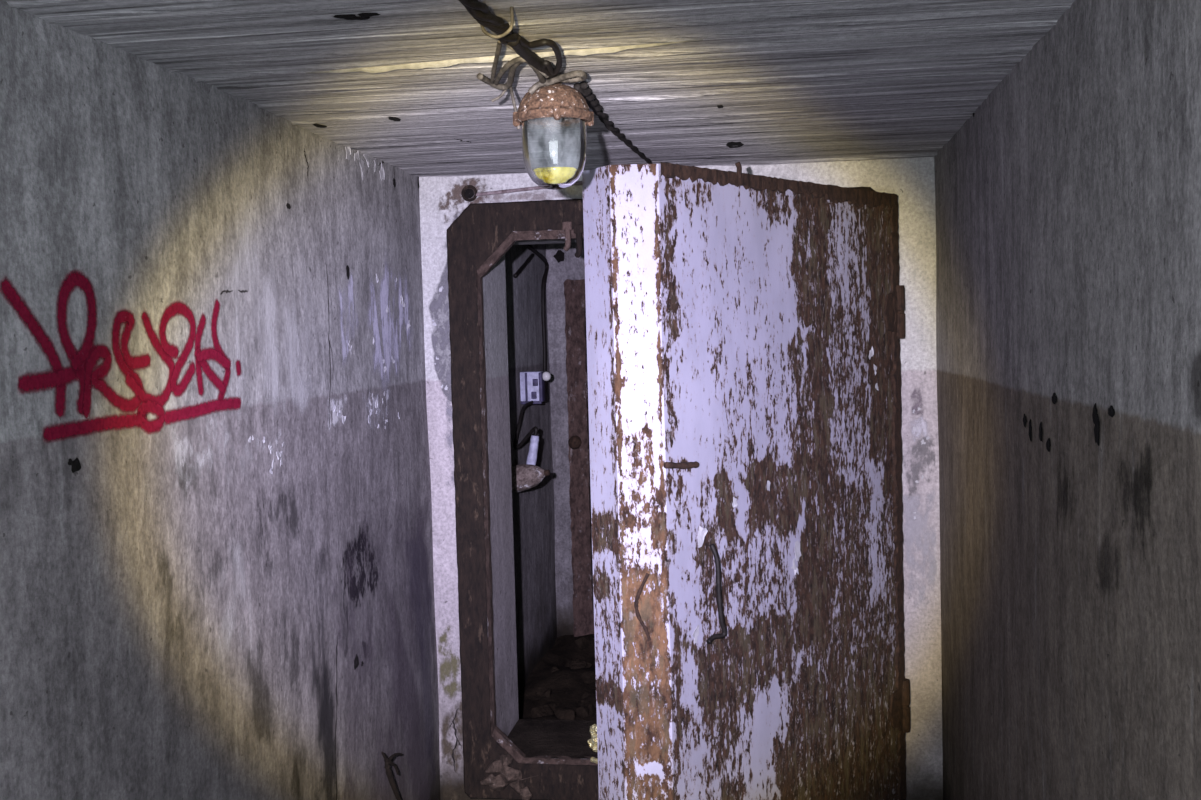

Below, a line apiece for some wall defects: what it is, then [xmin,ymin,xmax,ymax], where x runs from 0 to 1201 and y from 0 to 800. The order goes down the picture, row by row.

damp [341,528,378,625]
rust [634,573,651,641]
peeling [697,526,708,548]
peeling [791,540,801,575]